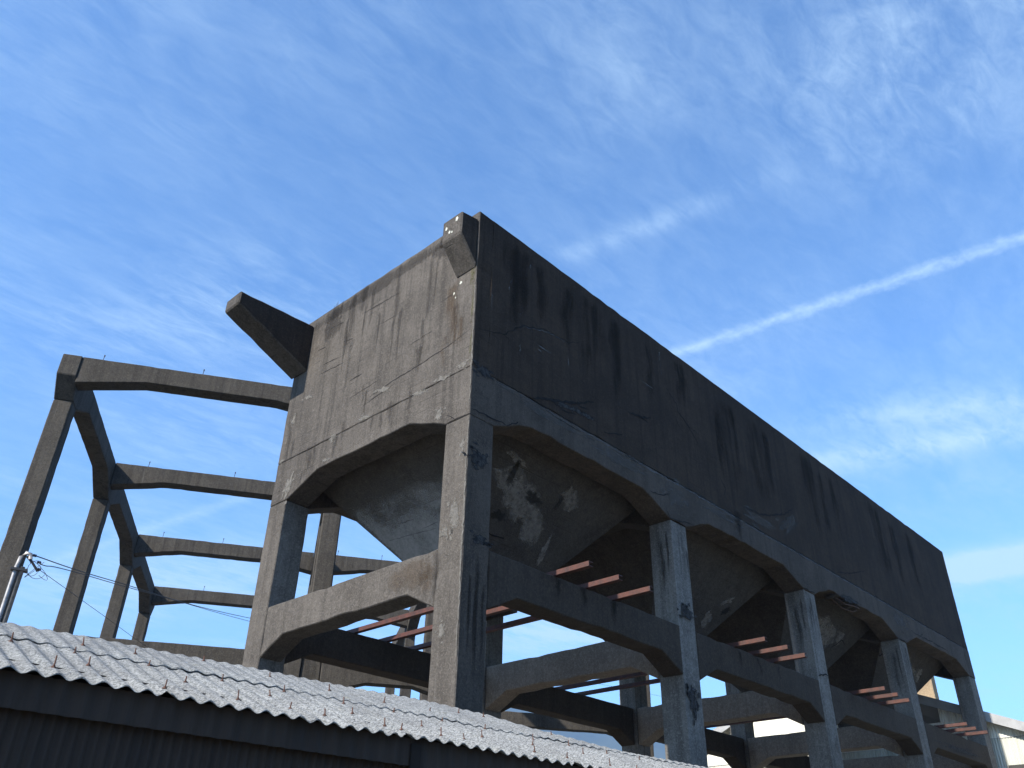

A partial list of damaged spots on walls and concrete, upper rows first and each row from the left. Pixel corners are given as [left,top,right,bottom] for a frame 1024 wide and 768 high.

crack [281,292,470,463]
peeling [459,436,577,566]